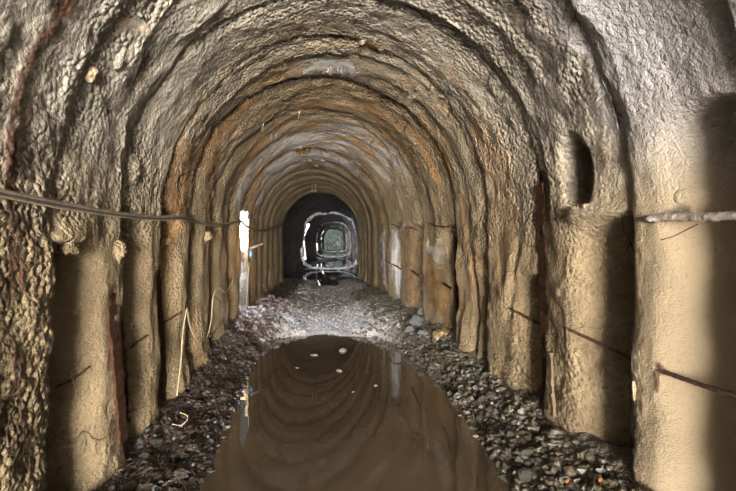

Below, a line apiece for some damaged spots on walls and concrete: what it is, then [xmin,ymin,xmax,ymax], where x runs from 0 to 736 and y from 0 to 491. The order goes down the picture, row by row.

rust [121,316,130,423]